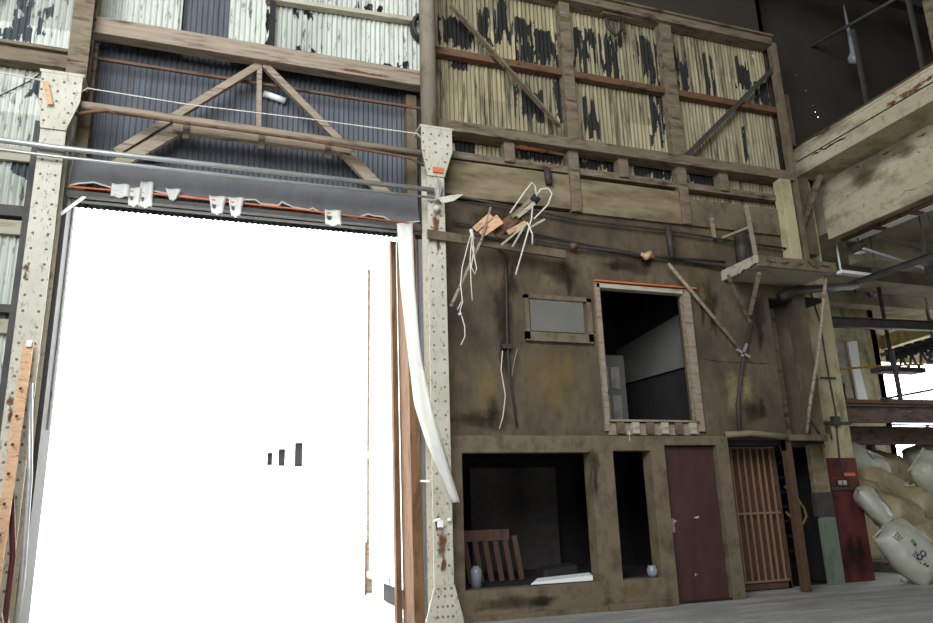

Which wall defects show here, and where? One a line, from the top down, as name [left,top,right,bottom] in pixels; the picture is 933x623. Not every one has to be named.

peeling [0,0,54,43]
peeling [24,80,41,98]
peeling [449,61,468,71]
peeling [437,0,559,68]
peeling [514,79,563,124]
peeling [582,96,600,140]
peeling [573,25,623,79]
peeling [635,35,665,148]
peeling [673,46,690,91]
peeling [452,140,475,154]
peeling [10,162,29,180]
corrosion [436,515,447,571]